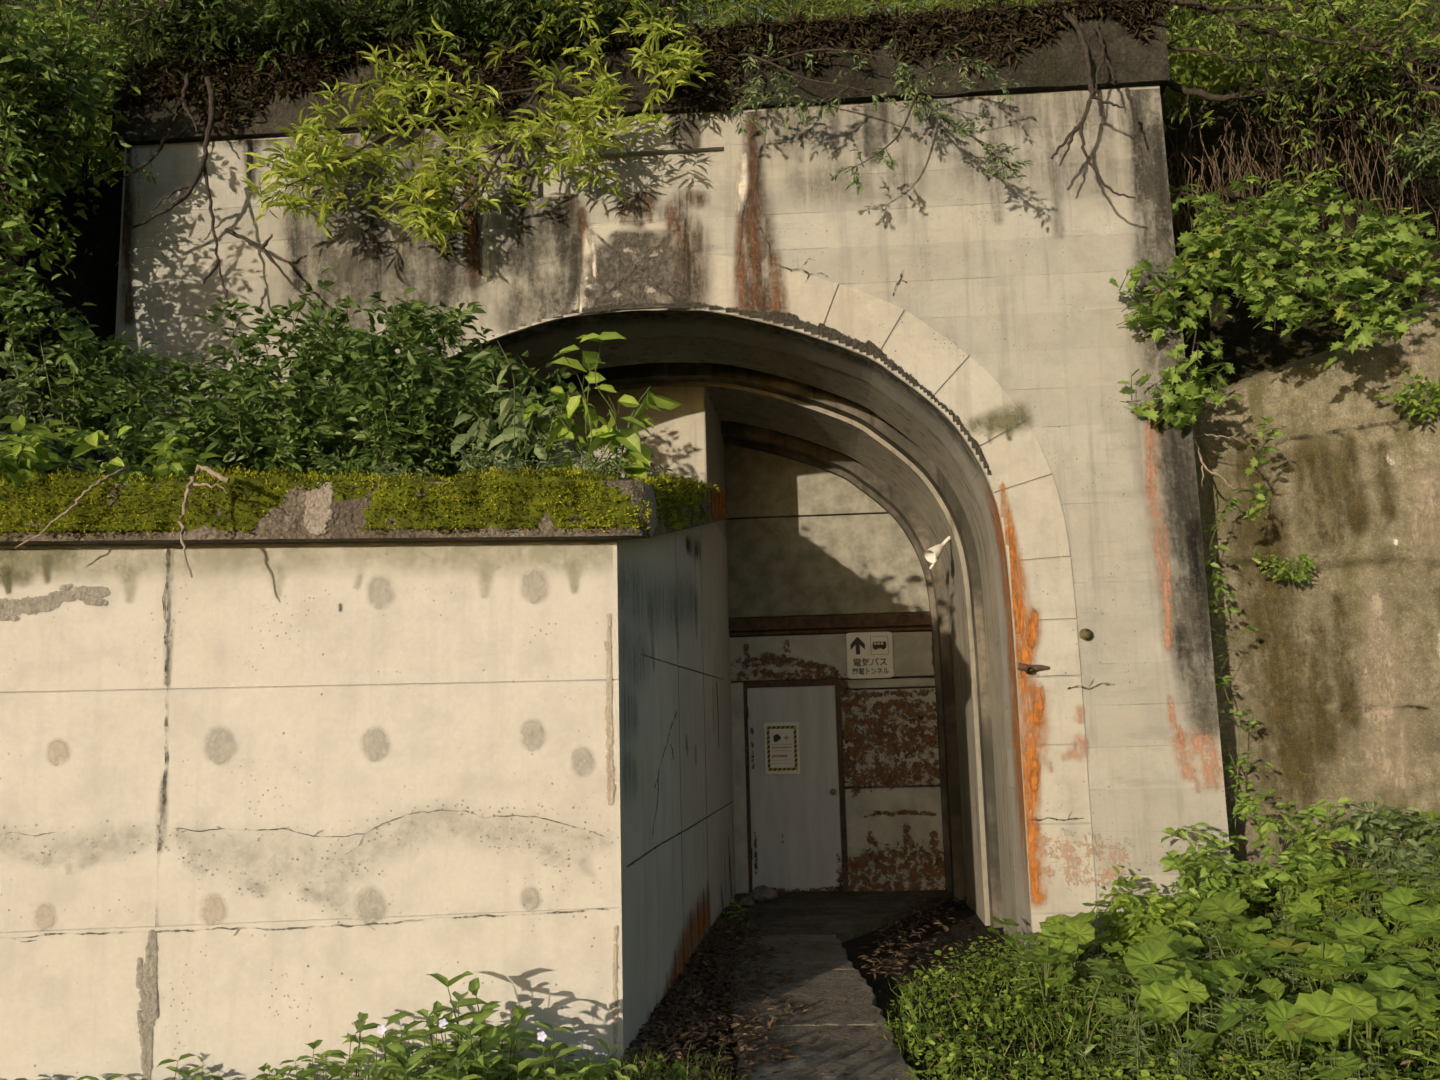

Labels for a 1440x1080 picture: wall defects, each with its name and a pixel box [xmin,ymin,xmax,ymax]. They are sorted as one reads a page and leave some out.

leakage [231,122,1029,466]
corrosion [736,111,784,321]
leakage [1132,89,1219,737]
corrosion [1146,404,1171,650]
corrosion [731,640,941,797]
corrosion [770,810,946,892]
corrosion [987,484,1052,905]
corrosion [1168,702,1220,791]
corrosion [659,898,710,1015]